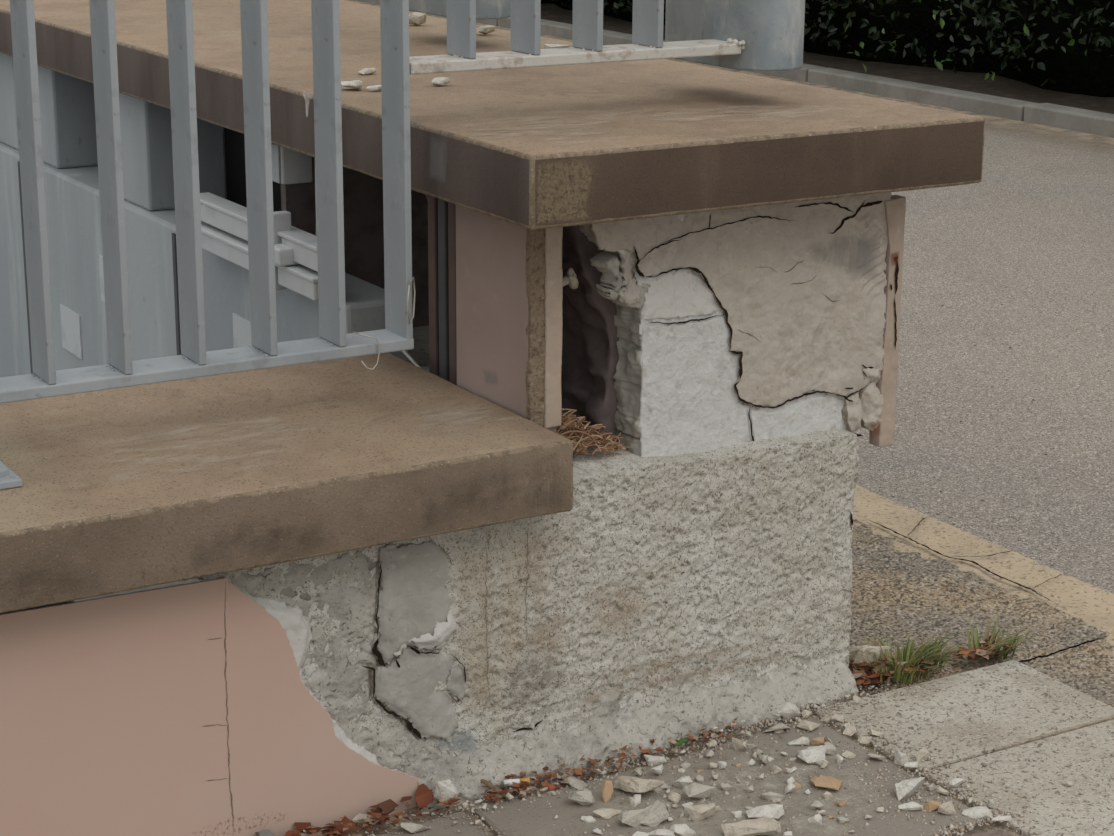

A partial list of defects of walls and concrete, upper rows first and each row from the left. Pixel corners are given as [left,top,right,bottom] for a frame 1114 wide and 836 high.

spalling [590,249,884,457]
crack [634,200,883,441]
crack [890,256,899,349]
spalling [234,541,471,780]